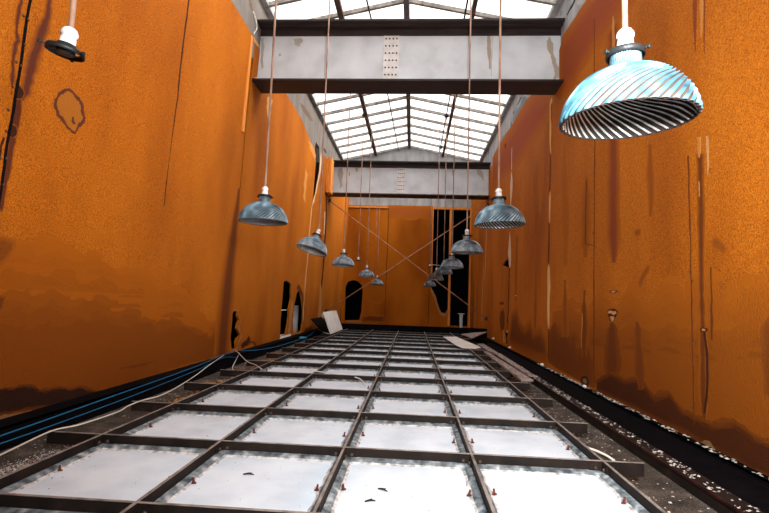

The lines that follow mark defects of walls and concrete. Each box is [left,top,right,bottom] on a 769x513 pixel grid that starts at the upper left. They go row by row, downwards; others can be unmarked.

water stain [0,0,54,212]
water stain [54,88,86,134]
water stain [0,188,241,416]
water stain [499,140,769,476]